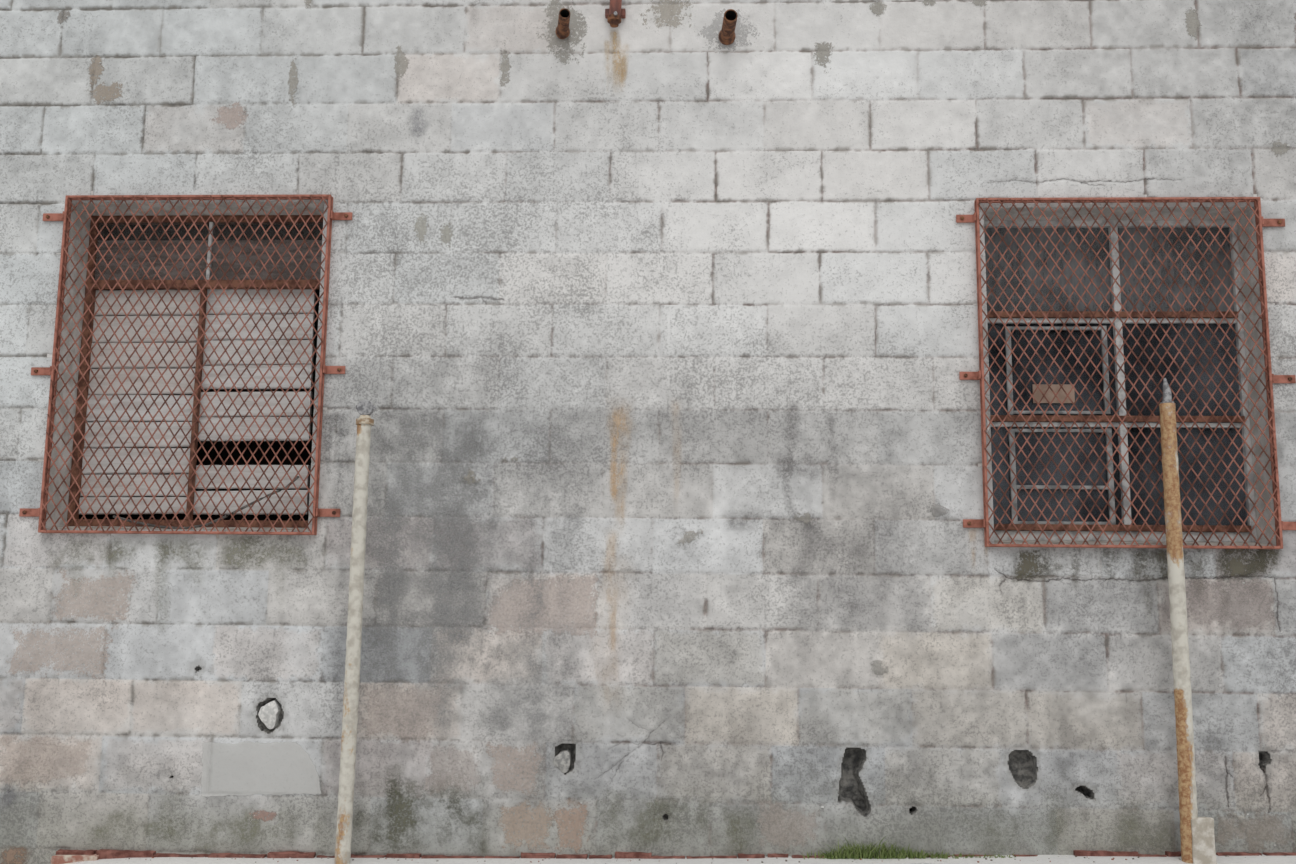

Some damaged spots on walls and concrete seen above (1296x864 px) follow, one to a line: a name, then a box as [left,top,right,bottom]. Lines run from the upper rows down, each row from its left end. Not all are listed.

damp [1015,550,1045,581]
damp [1135,550,1168,580]
damp [1218,549,1279,579]
spalling [256,698,284,734]
spalling [553,742,576,775]
spalling [821,747,871,817]
spalling [1007,750,1038,789]